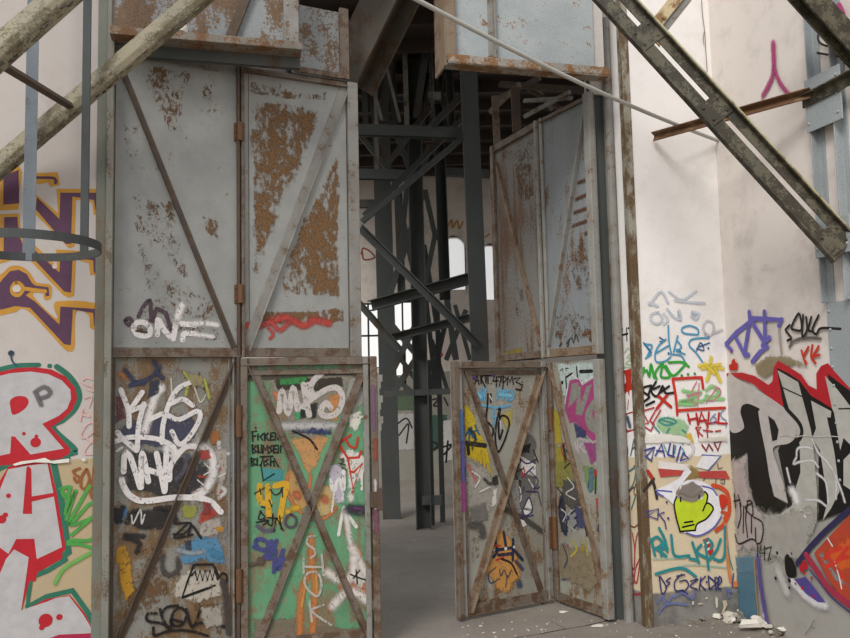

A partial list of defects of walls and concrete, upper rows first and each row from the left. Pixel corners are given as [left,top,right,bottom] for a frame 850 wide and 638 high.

rust [147,67,189,131]
rust [250,82,326,255]
rust [135,197,188,277]
rust [283,161,340,297]
rust [571,193,589,290]
rust [135,285,219,340]
rust [555,312,592,342]